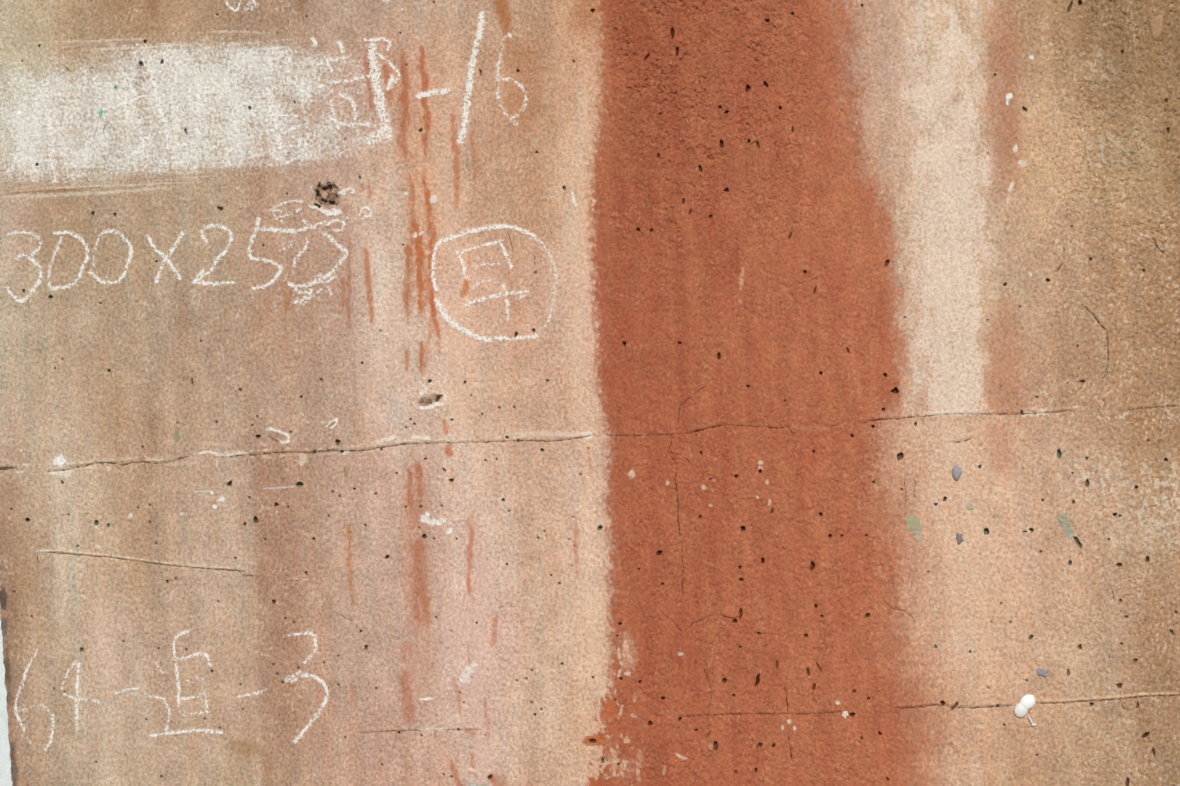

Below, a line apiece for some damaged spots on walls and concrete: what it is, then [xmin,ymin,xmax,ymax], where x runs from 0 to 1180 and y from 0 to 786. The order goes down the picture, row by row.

corrosion [365,47,431,155]
corrosion [451,114,460,201]
corrosion [364,250,373,321]
corrosion [402,177,440,336]
corrosion [405,341,424,371]
corrosion [582,0,941,786]
crack [0,456,188,472]
corrosion [407,462,423,513]
crack [222,387,794,631]
corrosion [413,540,430,620]
corrosion [466,528,474,595]